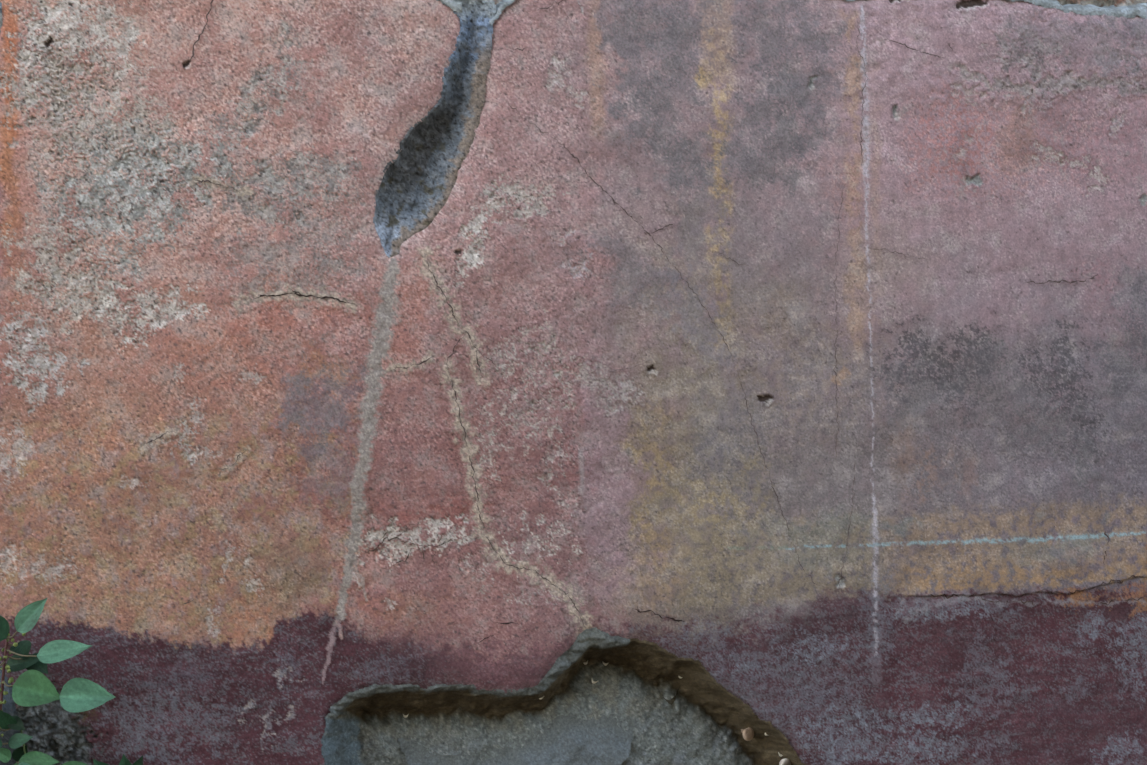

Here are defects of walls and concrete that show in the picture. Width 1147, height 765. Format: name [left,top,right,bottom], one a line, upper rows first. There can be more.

crack [183,0,213,68]
flaking render [0,0,496,492]
crack [504,98,855,589]
crack [226,240,599,685]
flaking render [467,305,655,574]
flaking render [353,512,565,612]
crack [899,532,1147,626]
spalling [0,661,109,765]
leakage [85,635,307,765]
leakage [334,642,428,692]
spalling [321,627,806,765]
leakage [655,565,1147,765]